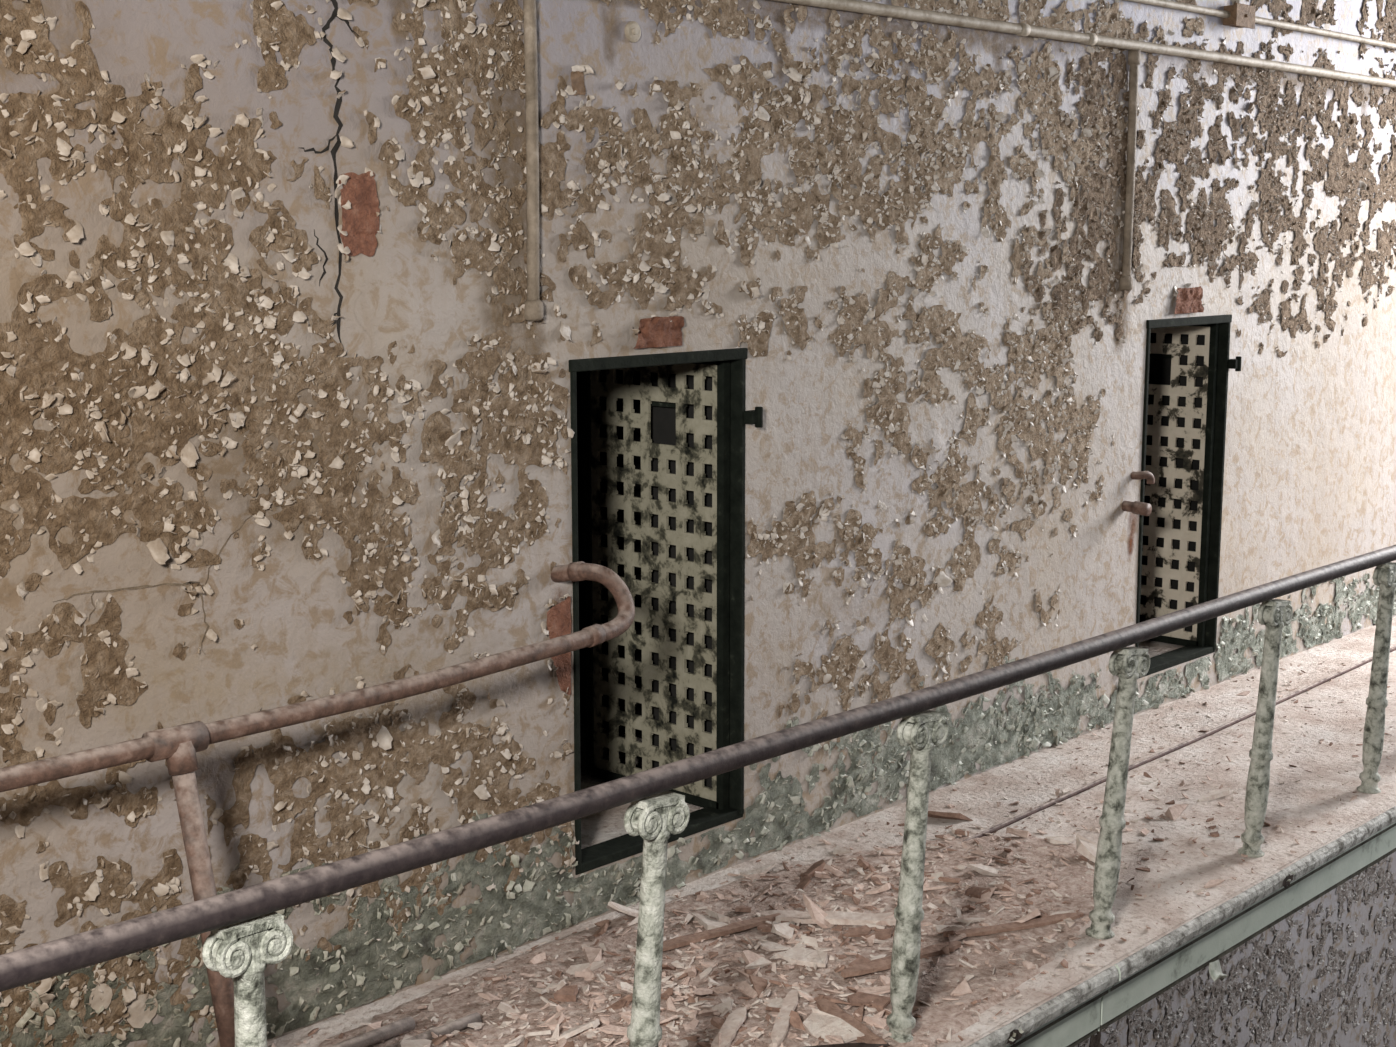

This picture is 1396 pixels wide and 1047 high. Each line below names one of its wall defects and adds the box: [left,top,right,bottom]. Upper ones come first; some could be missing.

peeling [0,0,1396,729]
peeling [0,894,38,955]
peeling [0,597,148,768]
peeling [0,759,183,933]
peeling [0,934,217,1047]
peeling [203,684,573,895]
peeling [265,821,643,1039]
peeling [666,722,911,890]
peeling [929,667,1118,791]